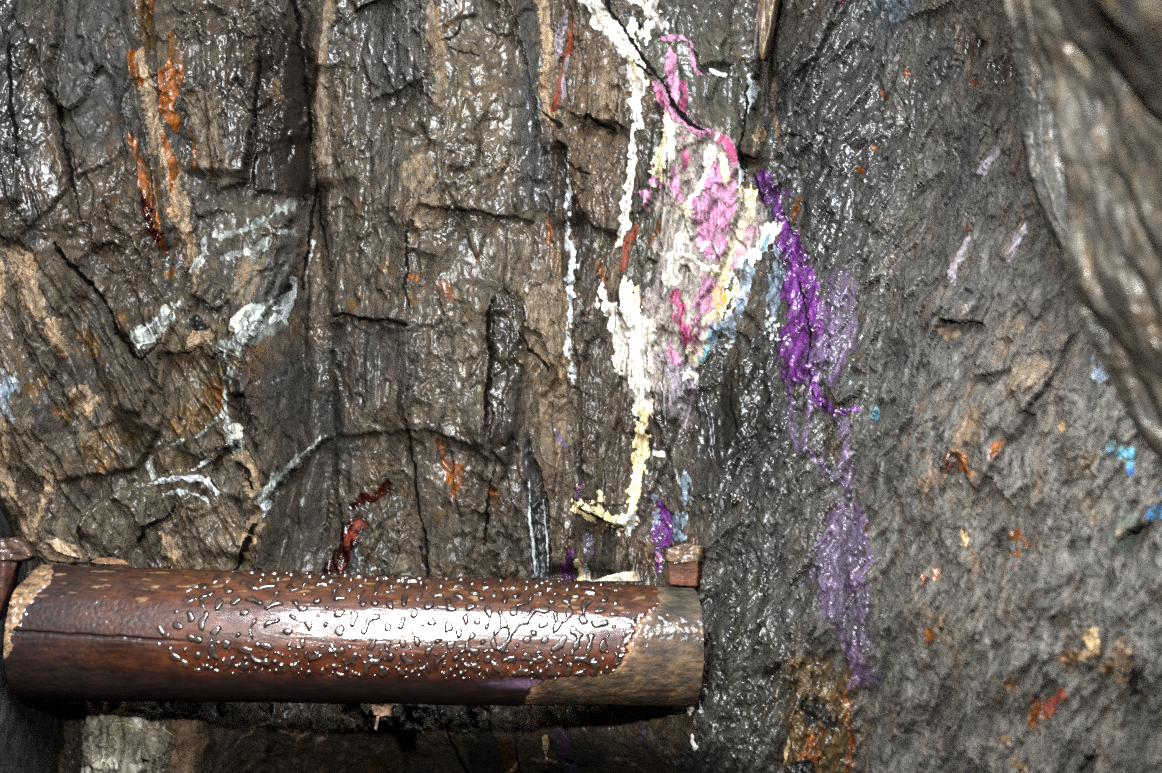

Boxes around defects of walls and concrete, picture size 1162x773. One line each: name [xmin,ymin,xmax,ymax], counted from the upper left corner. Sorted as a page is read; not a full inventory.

crack [6,29,19,157]
crack [43,84,84,225]
corrosion [125,0,197,279]
corrosion [23,370,50,405]
corrosion [51,397,77,426]
corrosion [76,329,100,357]
crack [52,241,160,360]
corrosion [79,425,135,474]
corrosion [318,478,391,574]
crack [333,229,410,327]
crack [405,417,430,577]